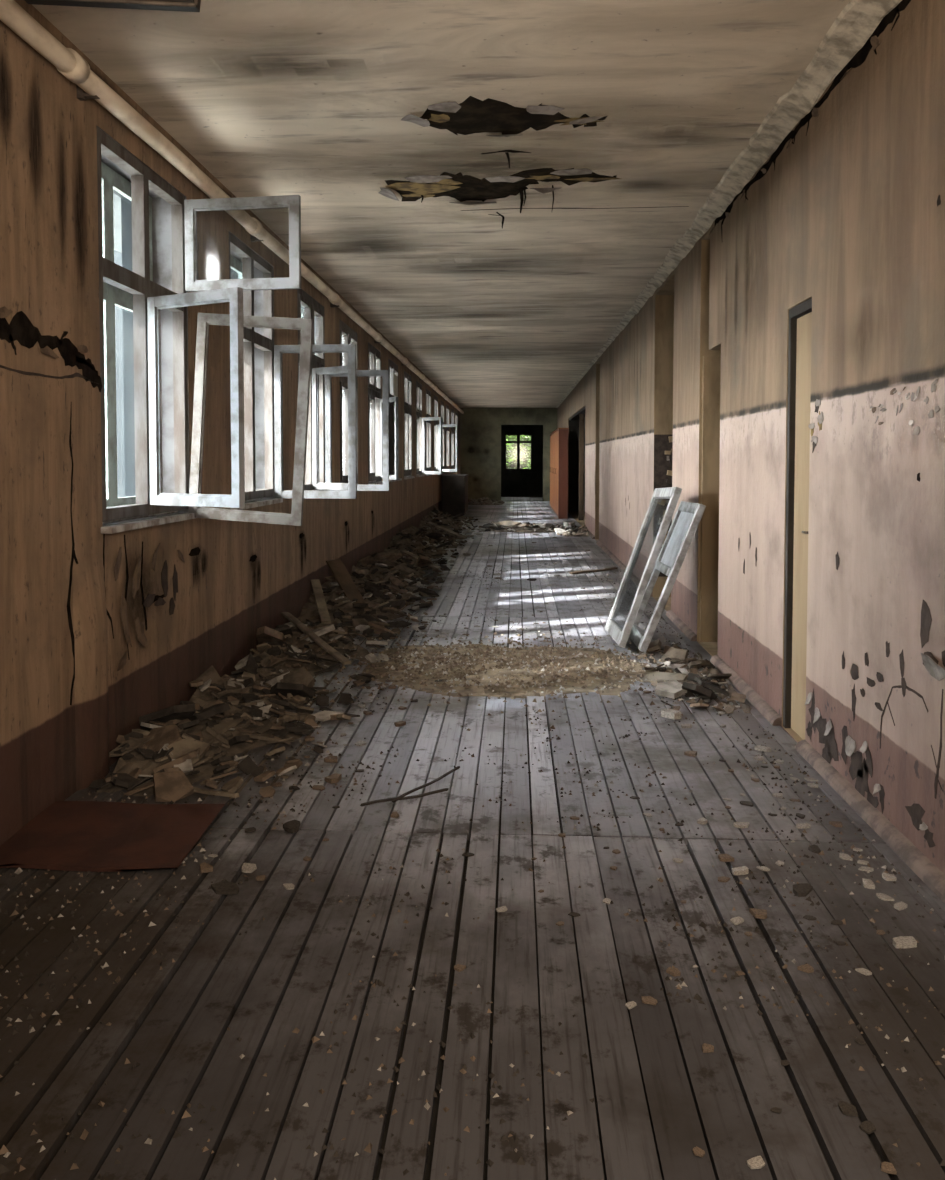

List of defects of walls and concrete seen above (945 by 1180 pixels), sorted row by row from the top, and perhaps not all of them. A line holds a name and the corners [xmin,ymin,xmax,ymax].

flaking render [378,96,620,213]
flaking render [808,399,824,453]
peeling [886,641,906,697]
peeling [920,600,945,681]
peeling [805,651,885,814]
peeling [905,803,935,848]